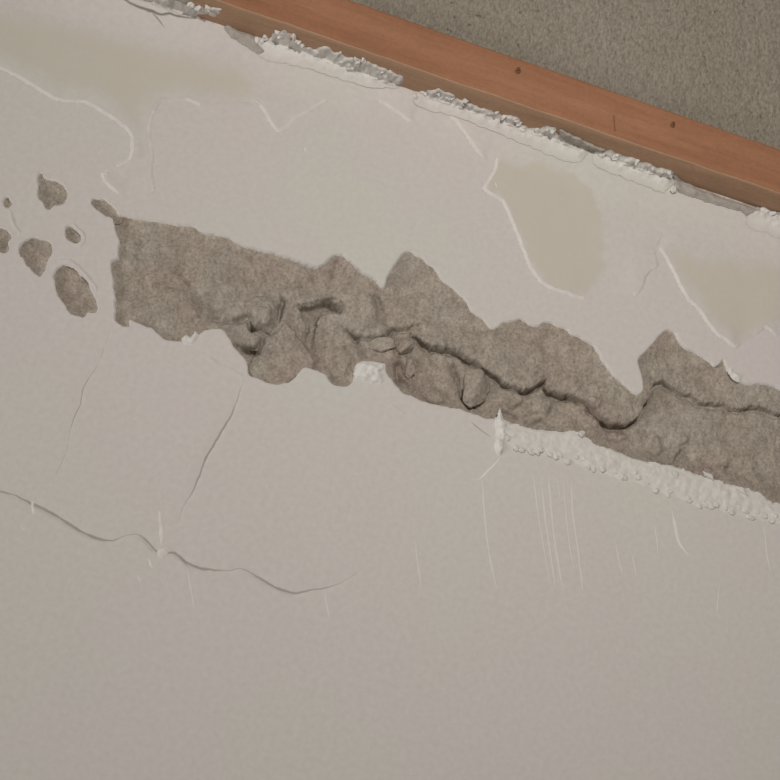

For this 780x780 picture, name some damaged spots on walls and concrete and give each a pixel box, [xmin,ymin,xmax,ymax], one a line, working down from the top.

flaking render [146,0,222,17]
peeling [223,24,780,300]
spalling [38,174,68,210]
spalling [0,228,11,253]
spalling [19,238,52,277]
spalling [65,227,81,244]
spalling [53,266,98,317]
flaking render [91,199,780,524]
crack [0,379,361,595]